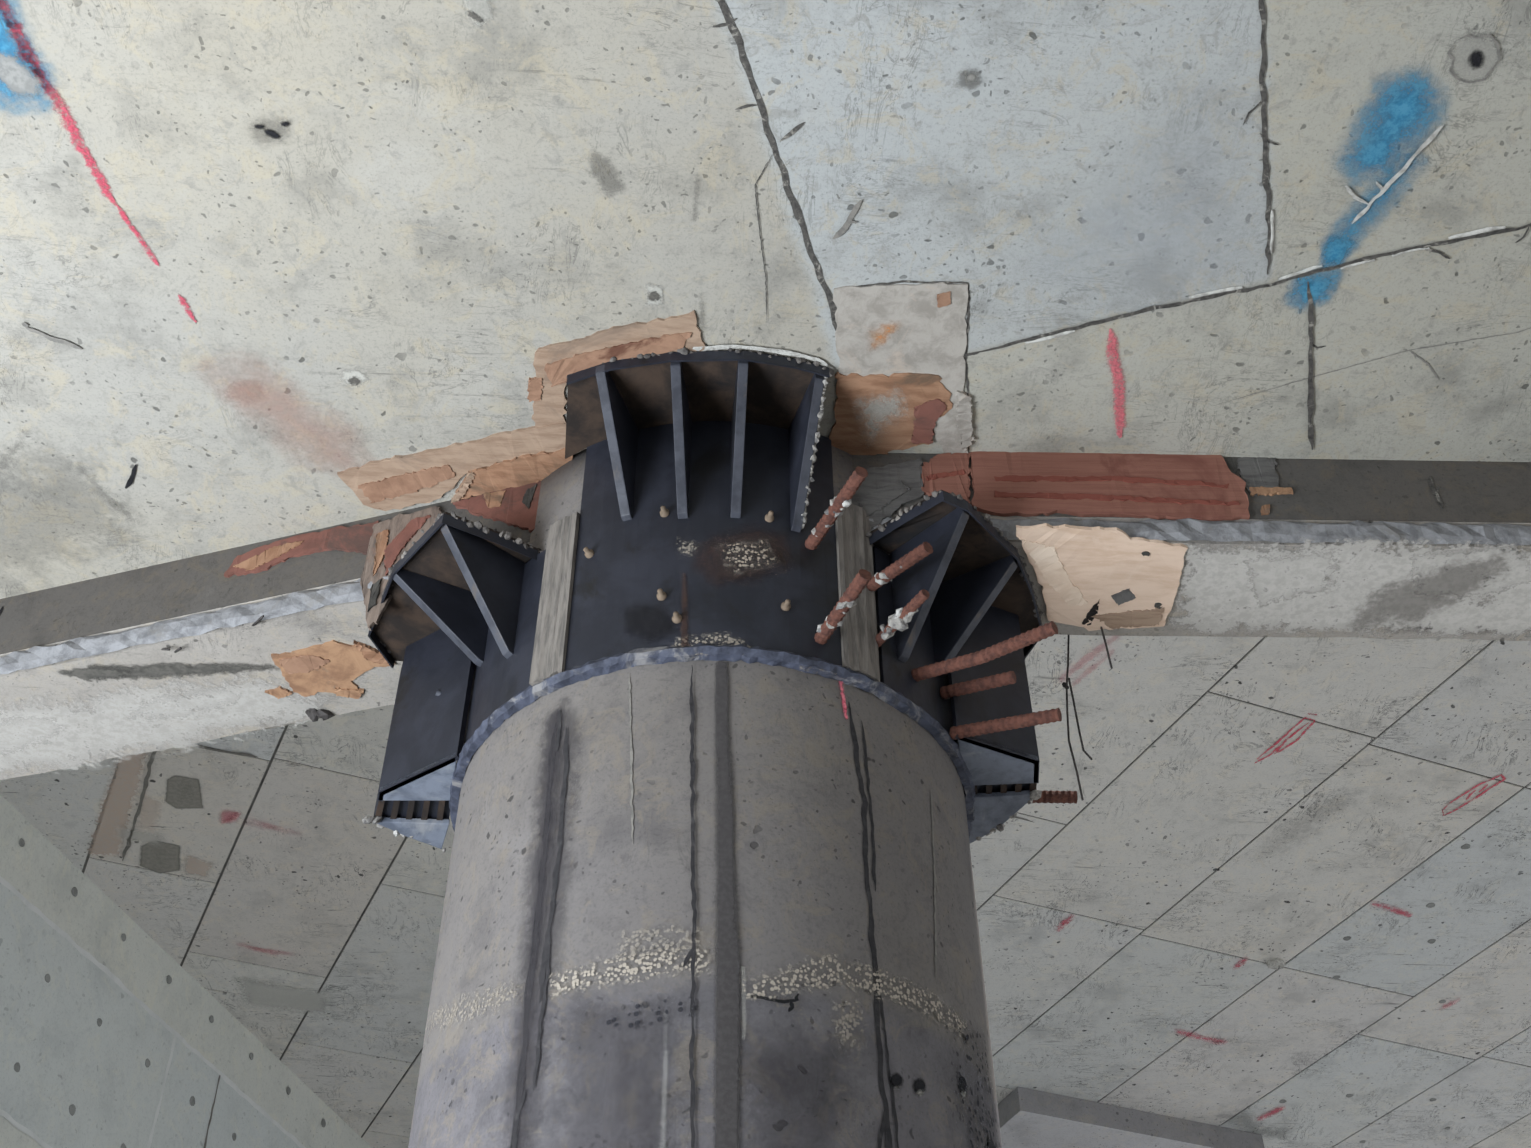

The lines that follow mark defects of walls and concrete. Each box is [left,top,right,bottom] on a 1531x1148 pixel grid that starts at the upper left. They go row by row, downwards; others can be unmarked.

crack [713,0,1531,450]
peeling [937,291,951,308]
spalling [341,370,368,387]
peeling [527,332,692,402]
peeling [911,399,947,444]
peeling [224,465,455,578]
crack [683,665,697,1148]
crack [848,702,899,1148]